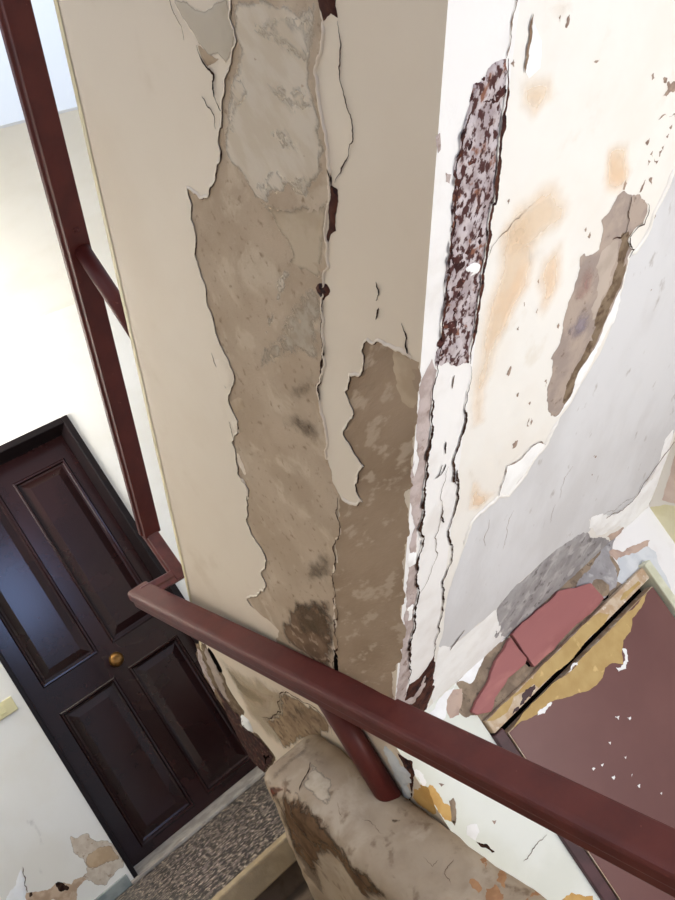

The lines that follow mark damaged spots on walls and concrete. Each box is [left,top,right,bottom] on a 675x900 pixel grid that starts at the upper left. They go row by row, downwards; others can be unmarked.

crack [506,0,518,58]
peeling [652,73,675,96]
rust [435,59,510,367]
peeling [169,0,437,702]
crack [316,298,324,402]
peeling [429,167,675,729]
crack [408,359,472,681]
crack [332,498,341,671]
peeling [265,691,333,748]
peeling [383,746,456,825]
peeling [6,833,124,900]
peeling [466,824,494,868]